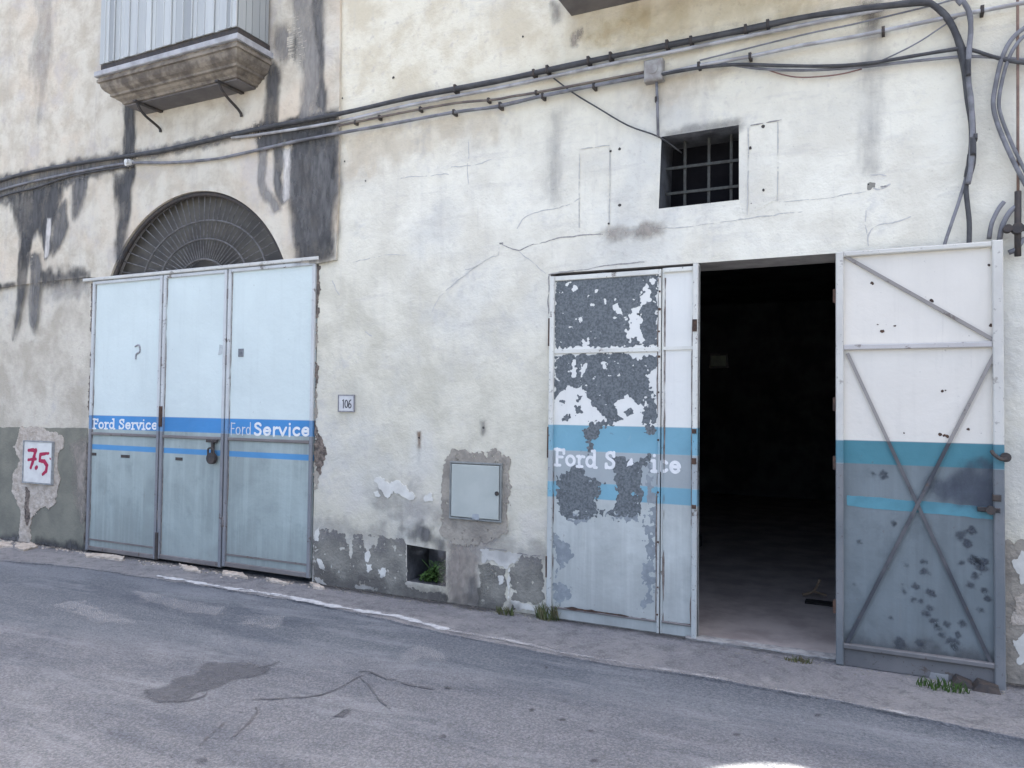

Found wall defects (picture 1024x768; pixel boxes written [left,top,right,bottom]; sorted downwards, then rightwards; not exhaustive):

damp [0,0,339,340]
crack [430,145,644,317]
damp [609,224,658,238]
spalling [313,362,327,490]
peeling [312,528,448,604]
peeling [373,448,574,611]
spalling [1005,539,1024,687]